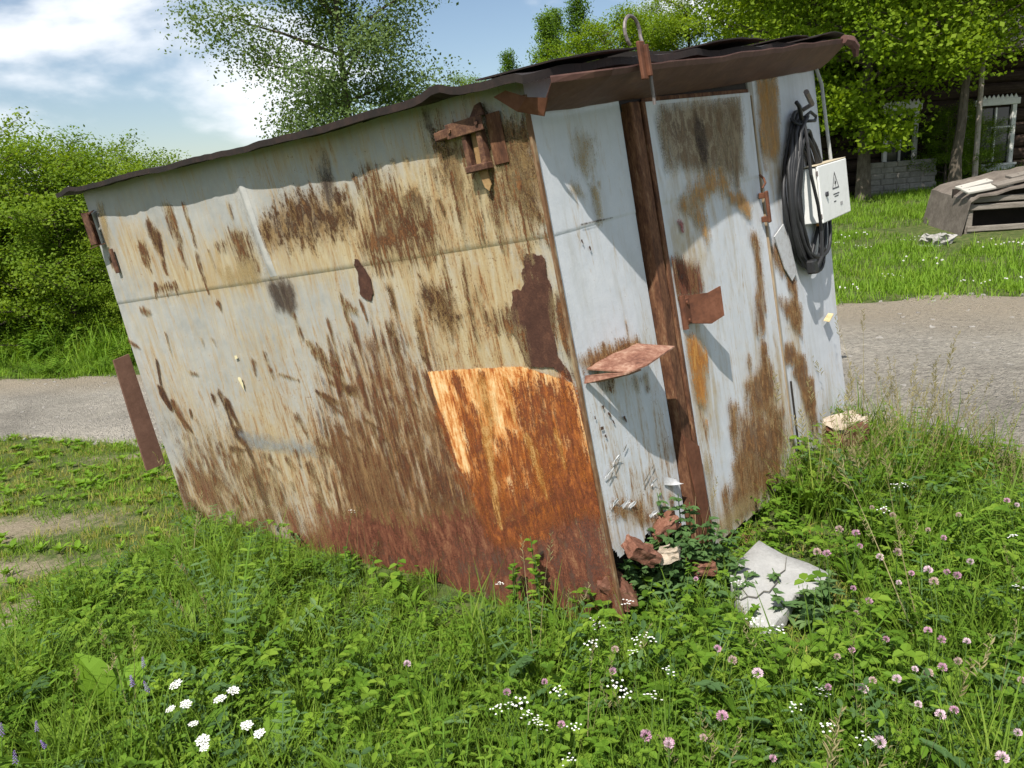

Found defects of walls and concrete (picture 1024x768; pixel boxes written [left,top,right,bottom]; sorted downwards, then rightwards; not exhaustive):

corrosion [137,96,674,632]
corrosion [657,96,817,534]